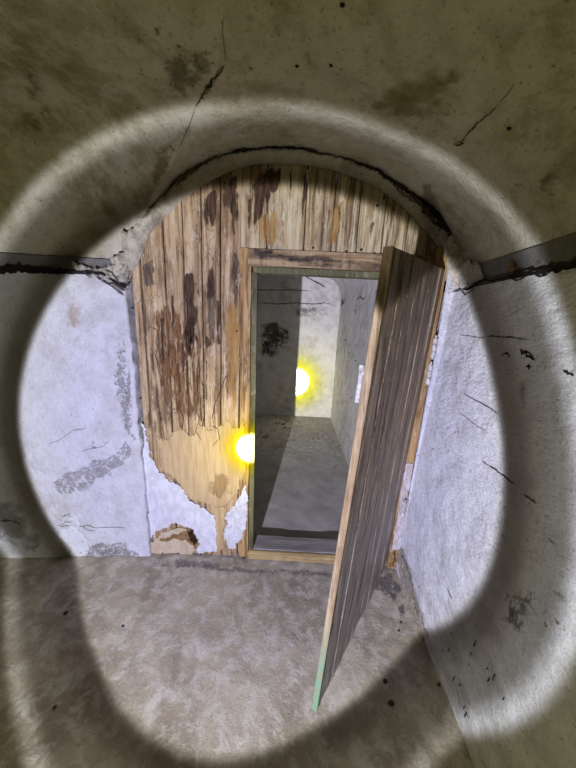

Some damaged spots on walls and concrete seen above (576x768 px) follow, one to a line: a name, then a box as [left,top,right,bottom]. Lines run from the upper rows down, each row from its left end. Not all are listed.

crack [179,16,226,147]
crack [453,84,514,146]
water stain [203,176,238,233]
flaking render [71,259,129,291]
crack [452,260,576,295]
mould [262,323,289,356]
water stain [151,267,246,551]
peeling [141,423,249,554]